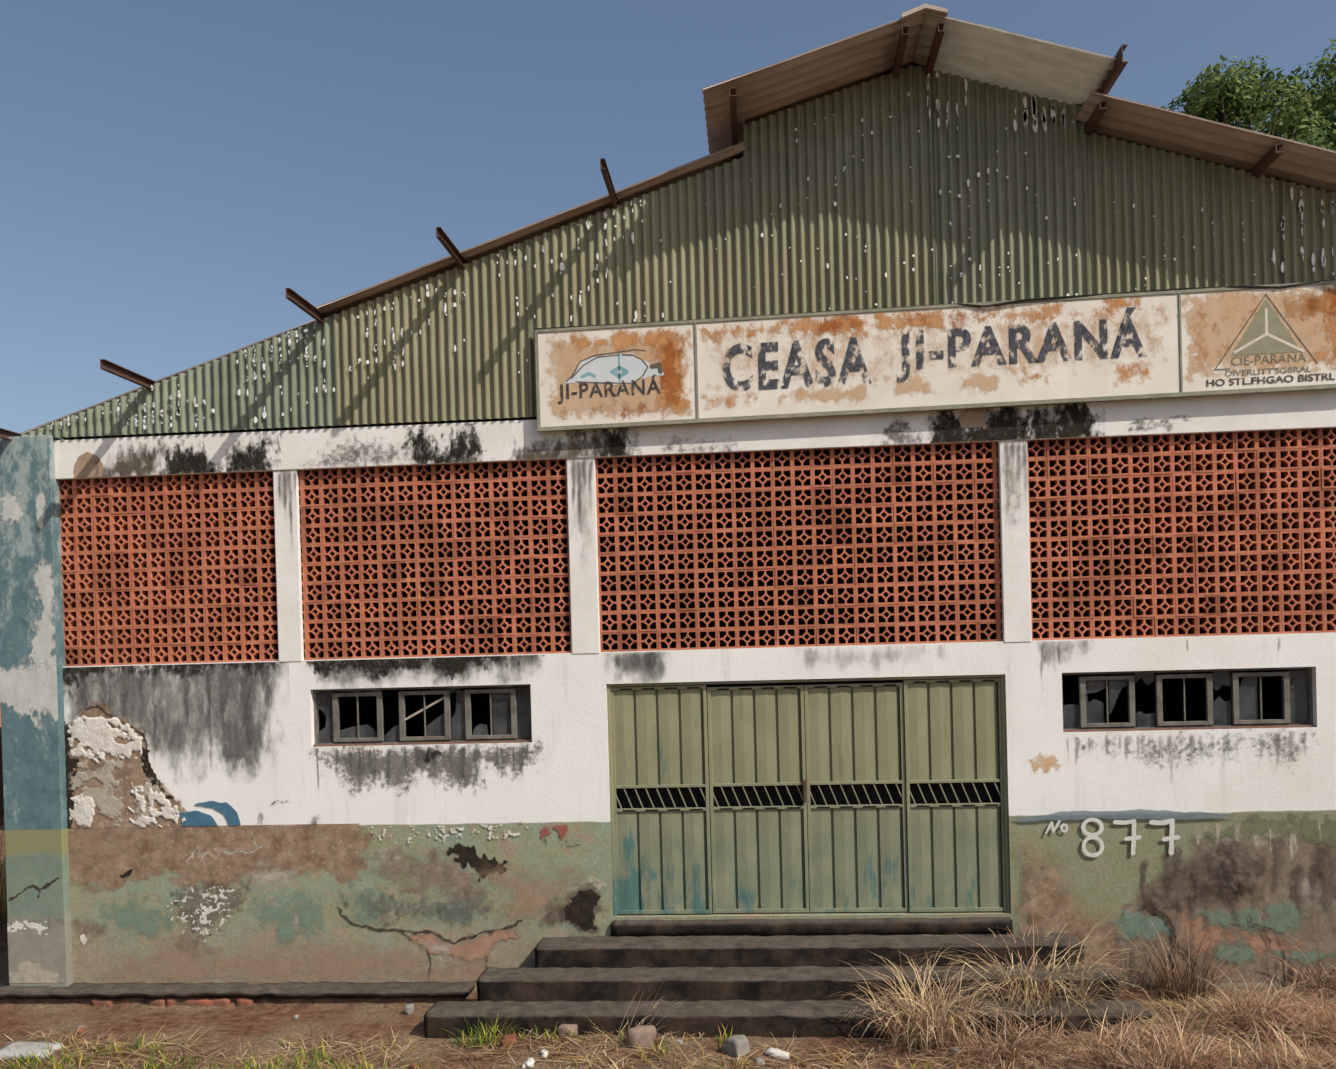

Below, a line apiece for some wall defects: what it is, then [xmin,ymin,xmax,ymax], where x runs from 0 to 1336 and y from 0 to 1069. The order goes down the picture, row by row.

peeling [1005,95,1074,133]
peeling [570,199,643,322]
leakage [321,423,483,466]
leakage [63,662,277,766]
peeling [0,560,529,943]
leakage [315,740,542,793]
leakage [1082,737,1240,763]
leakage [1254,733,1315,761]
flaking render [543,876,606,933]
peeling [1019,813,1336,983]
peeling [7,917,104,983]
crack [337,907,522,982]